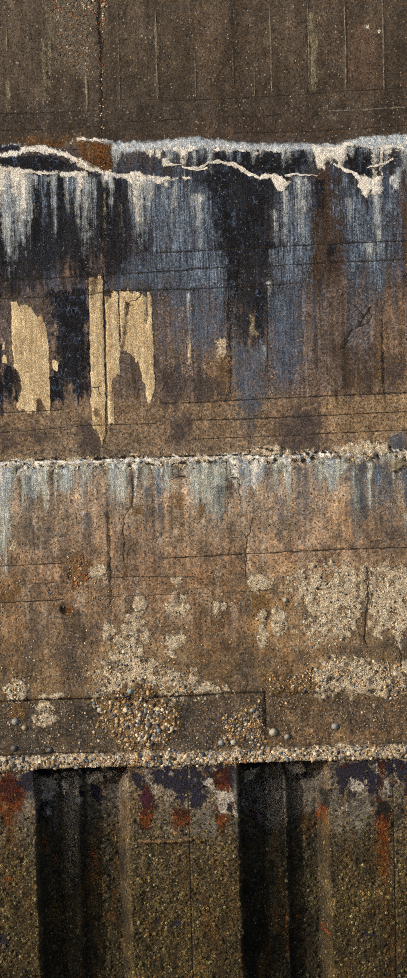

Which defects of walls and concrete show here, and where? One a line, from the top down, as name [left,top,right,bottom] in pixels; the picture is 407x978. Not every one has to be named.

crack [96,0,104,140]
corrosion [79,143,112,170]
water stain [0,134,407,420]
spalling [0,274,407,508]
water stain [0,464,72,571]
water stain [107,459,172,510]
water stain [188,453,307,523]
water stain [274,409,389,508]
corrosion [0,771,28,833]
corrosion [139,784,156,830]
corrosion [213,765,232,832]
corrosion [374,801,392,895]